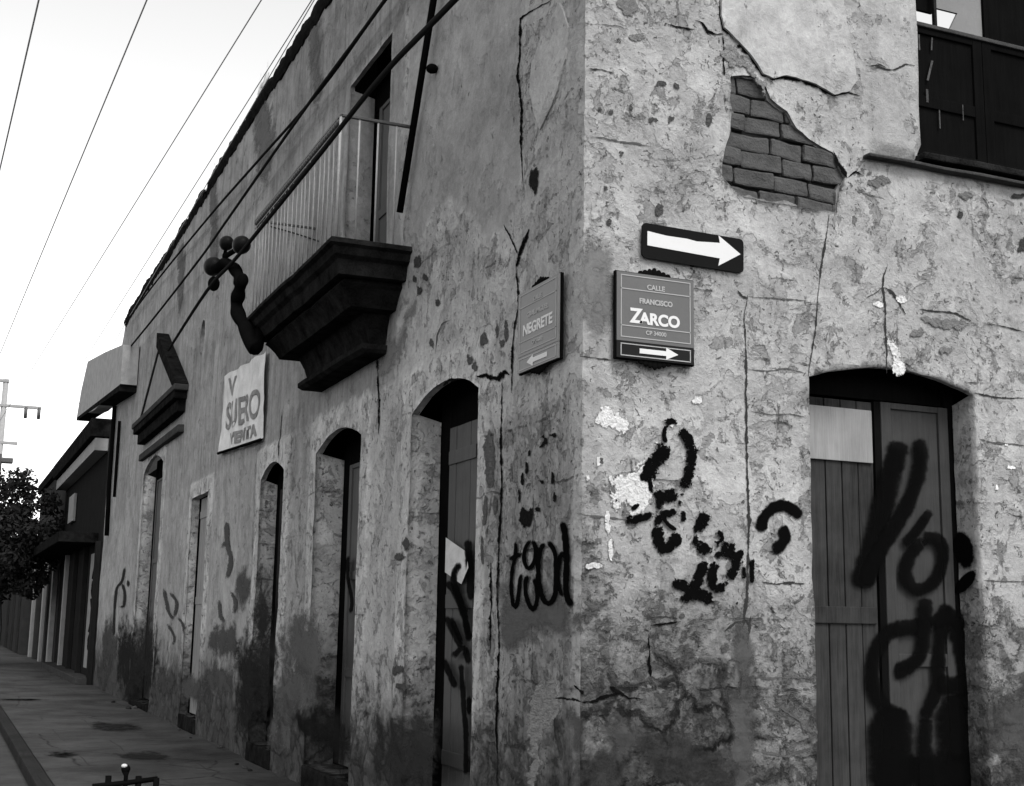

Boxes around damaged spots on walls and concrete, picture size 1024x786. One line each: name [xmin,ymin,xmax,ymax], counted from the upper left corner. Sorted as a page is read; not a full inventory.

crack [515,0,551,181]
crack [668,0,859,96]
flaking render [722,76,843,212]
crack [868,265,1023,372]
spalling [595,406,629,434]
crack [725,218,829,634]
damp [97,564,351,778]
crack [556,621,681,703]